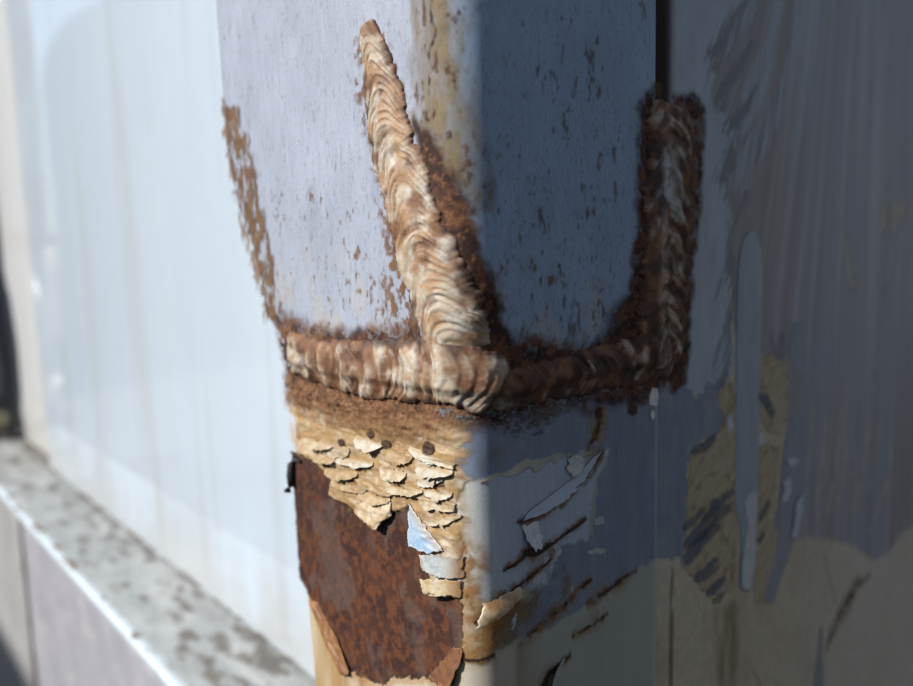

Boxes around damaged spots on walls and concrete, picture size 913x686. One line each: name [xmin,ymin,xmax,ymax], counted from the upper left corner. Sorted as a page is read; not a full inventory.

corrosion [412,0,661,369]
corrosion [222,93,705,443]
corrosion [290,451,518,686]
peeling [288,387,626,549]
peeling [531,544,562,588]
peeling [637,385,659,420]
peeling [684,382,759,604]
peeling [758,352,789,434]
peeling [781,456,804,538]